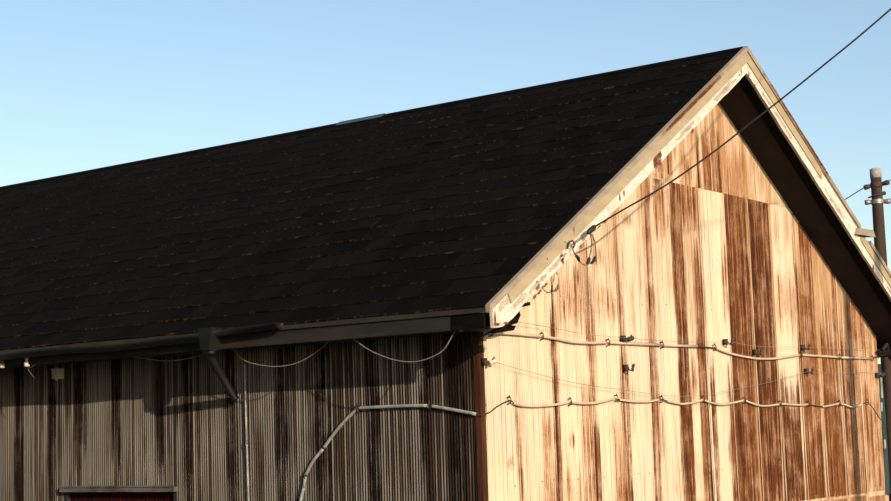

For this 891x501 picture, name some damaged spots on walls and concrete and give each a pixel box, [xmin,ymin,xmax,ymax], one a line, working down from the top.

corrosion [533,227,634,501]
corrosion [643,121,884,501]